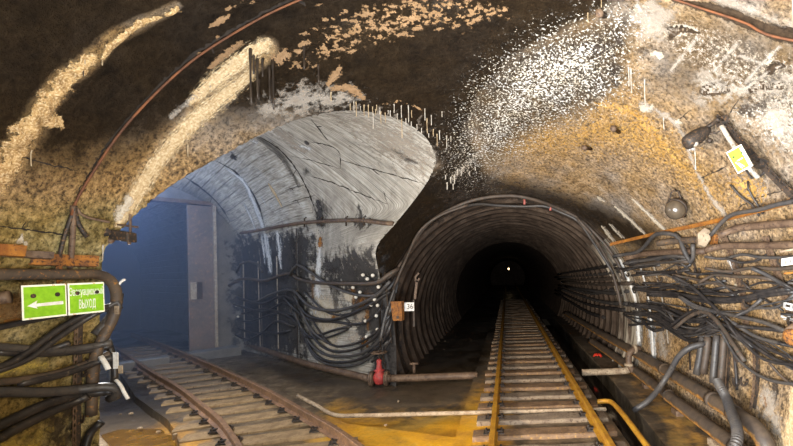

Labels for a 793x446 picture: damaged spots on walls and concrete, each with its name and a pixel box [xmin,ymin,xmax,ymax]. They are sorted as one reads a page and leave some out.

peeling [209,5,237,39]
peeling [260,0,508,123]
leakage [718,0,777,21]
leakage [432,0,768,223]
leakage [252,137,299,188]
crack [264,120,423,211]
leakage [222,170,407,391]